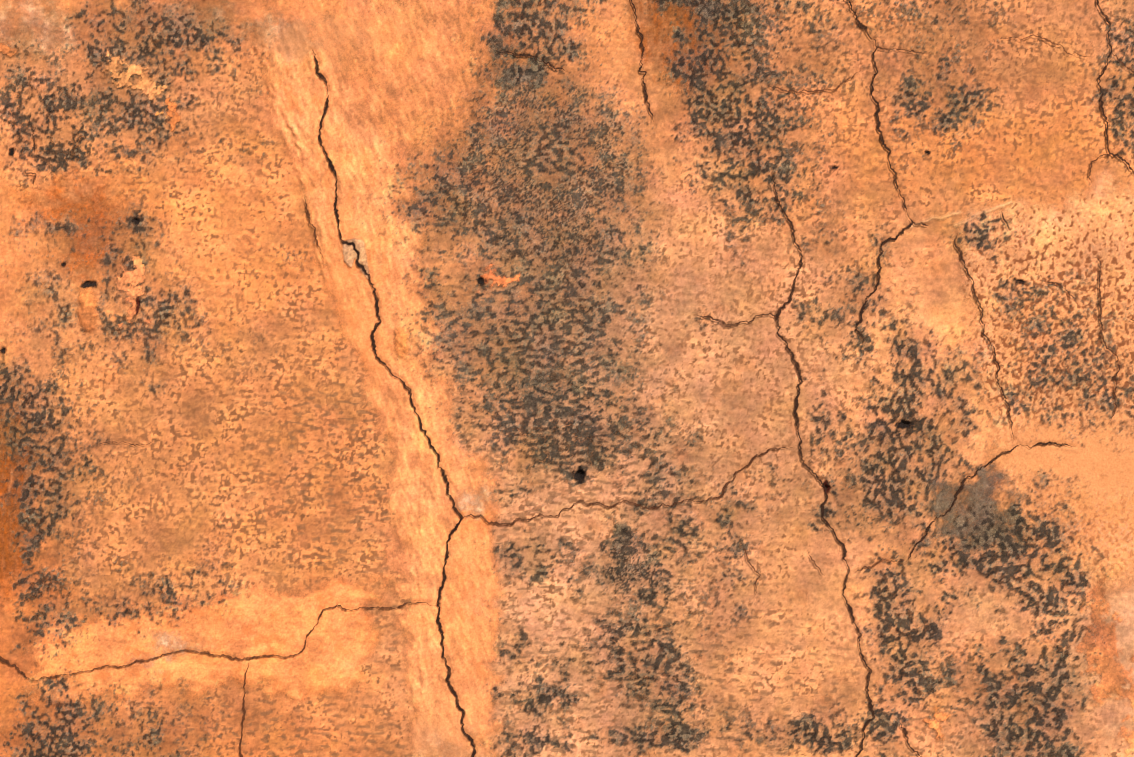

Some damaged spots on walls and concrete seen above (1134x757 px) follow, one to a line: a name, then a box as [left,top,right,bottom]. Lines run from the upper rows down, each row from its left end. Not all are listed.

water stain [0,0,279,656]
crack [0,50,793,757]
crack [631,0,653,120]
water stain [382,0,1134,757]
crack [768,0,928,348]
crack [697,175,1075,757]
crack [1000,0,1134,179]
crack [1044,256,1120,421]
water stain [3,665,208,757]